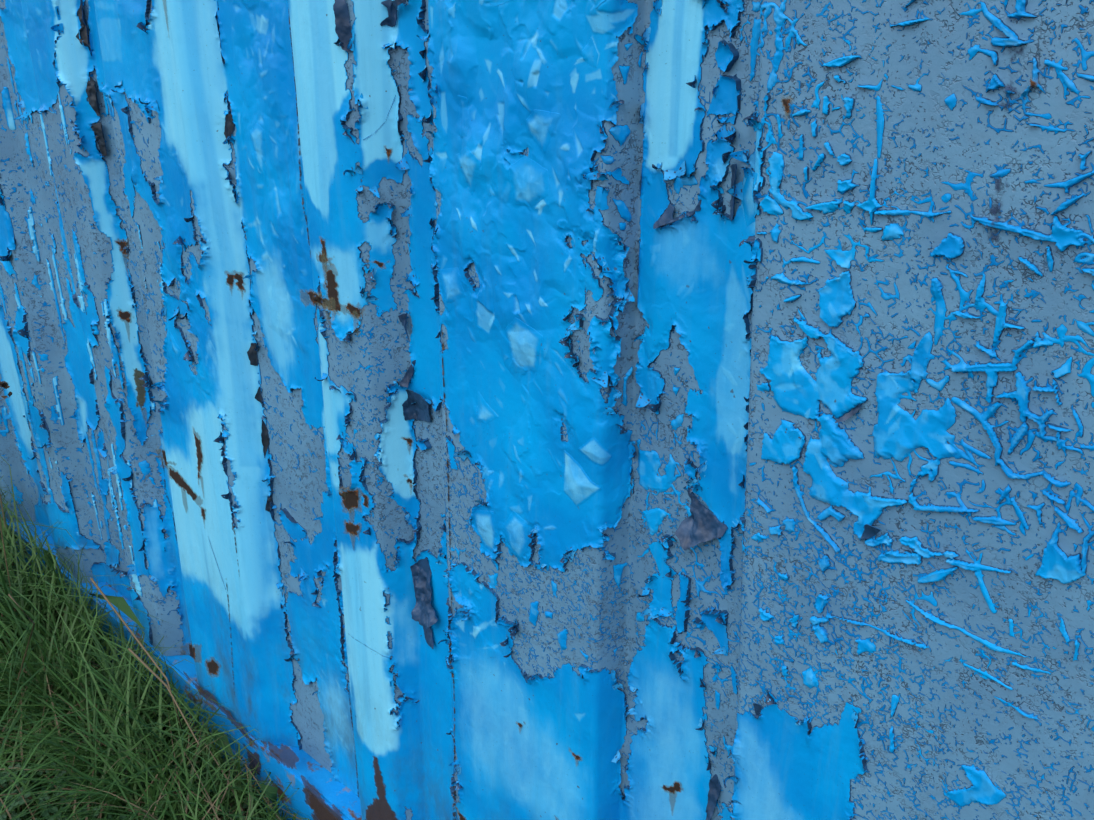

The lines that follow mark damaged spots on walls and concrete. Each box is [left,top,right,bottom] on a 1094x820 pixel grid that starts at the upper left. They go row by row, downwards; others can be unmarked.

peeling [223,91,239,198]
corrosion [227,274,244,290]
corrosion [307,240,360,317]
peeling [0,0,207,656]
peeling [247,0,1094,820]
corrosion [162,434,206,519]
peeling [214,414,238,527]
corrosion [345,522,359,535]
corrosion [339,490,368,509]
corrosion [189,645,219,675]
corrosion [183,671,343,820]
corrosion [366,756,398,820]